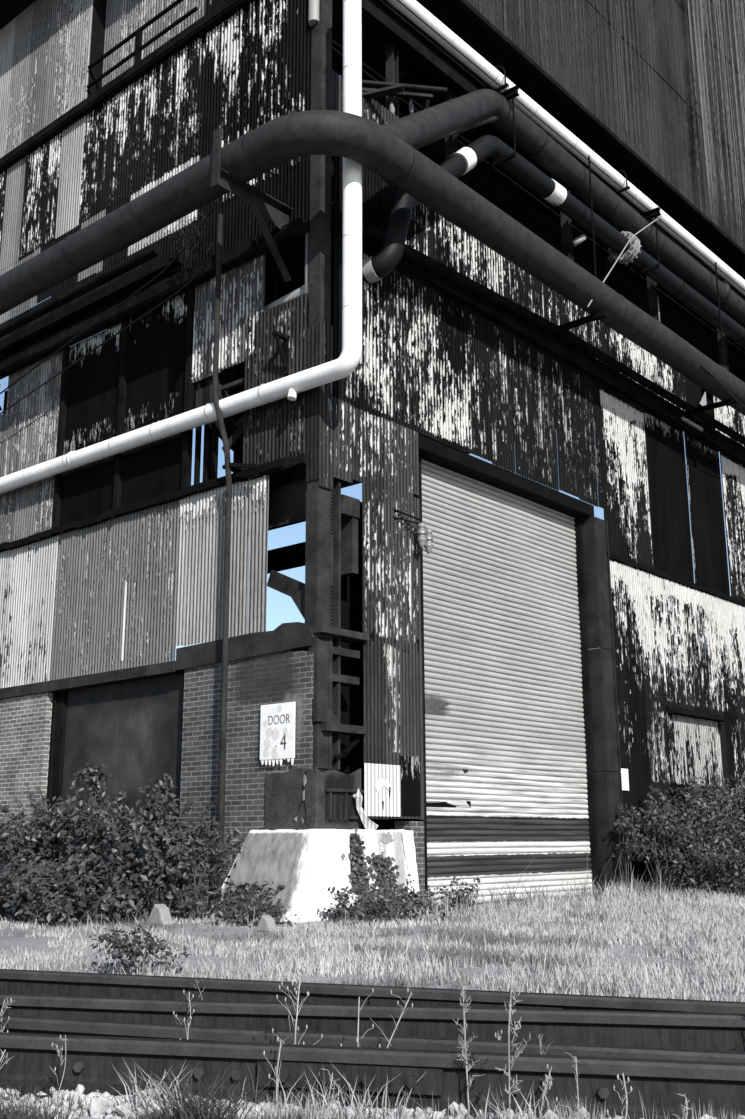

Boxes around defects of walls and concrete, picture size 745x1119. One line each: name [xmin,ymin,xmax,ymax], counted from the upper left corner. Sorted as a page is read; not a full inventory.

peeling [5,0,89,258]
peeling [0,255,305,476]
peeling [130,210,196,251]
peeling [79,0,305,221]
peeling [405,204,686,411]
peeling [1,476,55,543]
peeling [325,271,745,816]